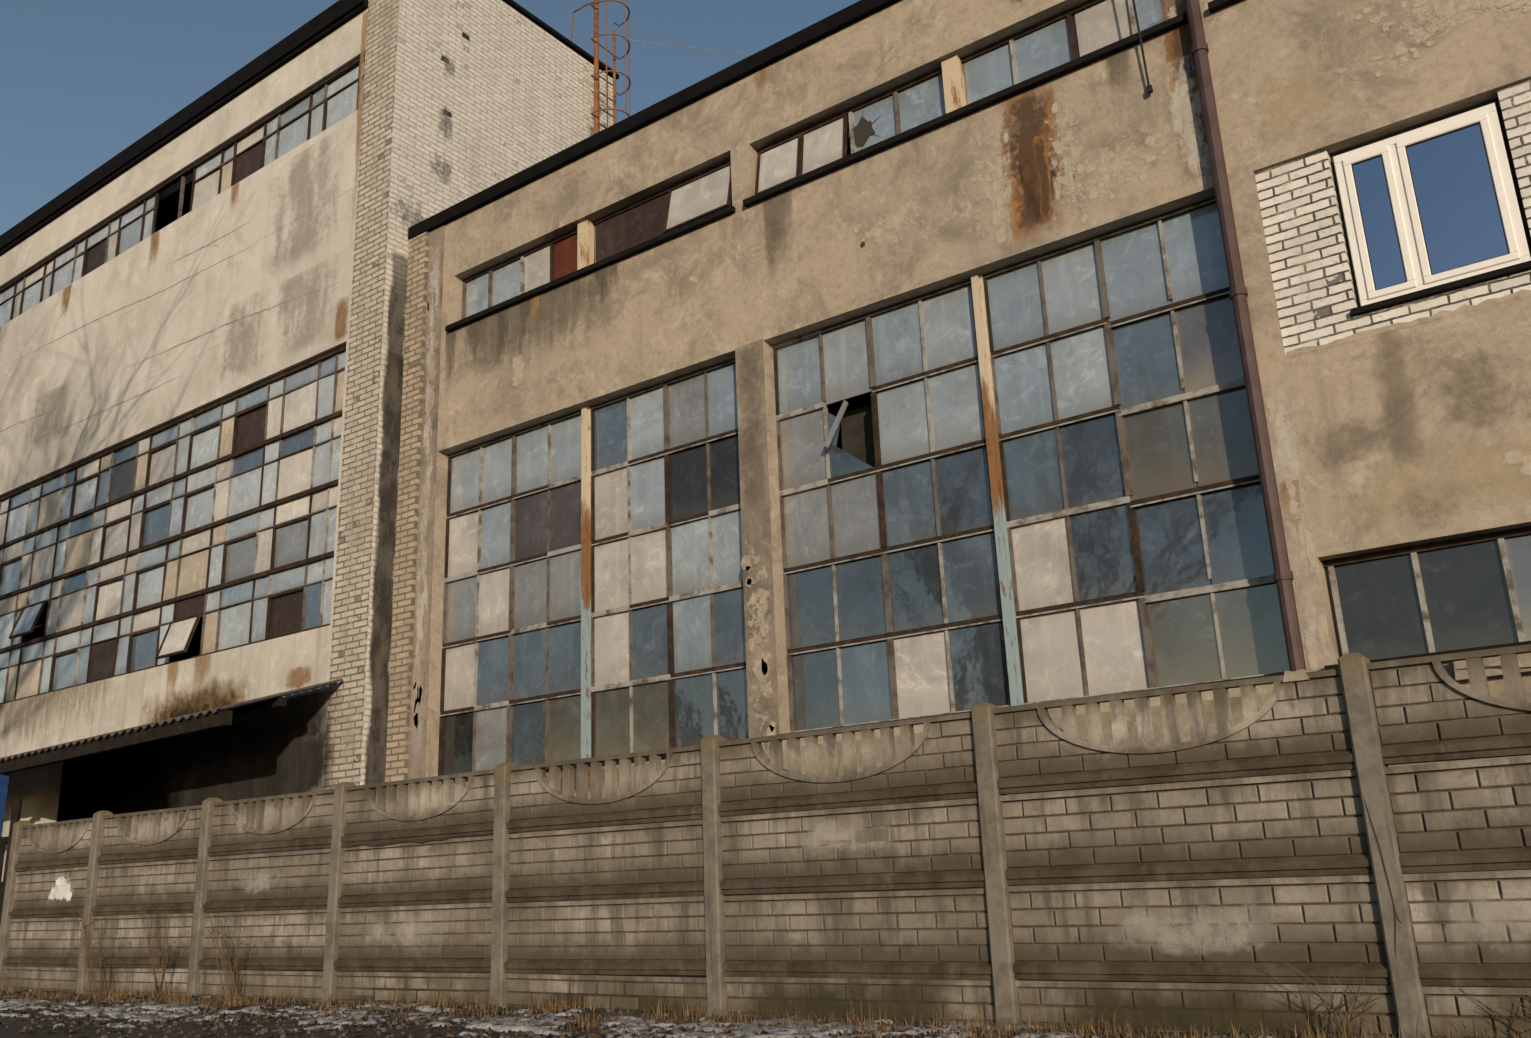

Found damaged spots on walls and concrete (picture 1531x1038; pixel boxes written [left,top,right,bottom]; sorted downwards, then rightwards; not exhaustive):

corrosion [1001,91,1062,236]
corrosion [1163,0,1211,189]
peeling [1354,0,1531,78]
peeling [1501,450,1531,476]
damp [365,359,403,796]
flaking render [741,543,776,750]